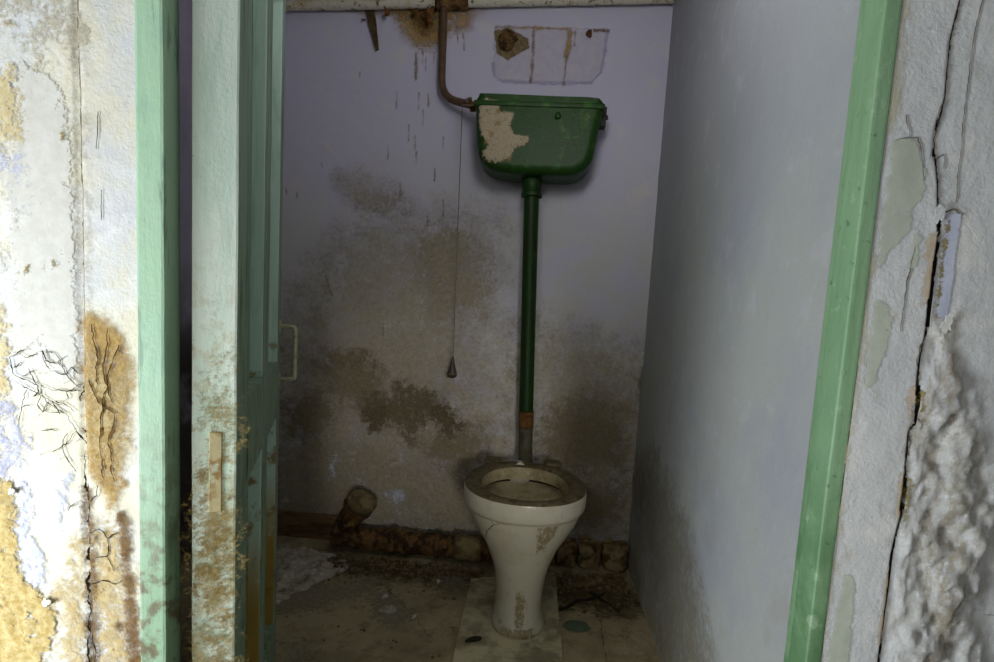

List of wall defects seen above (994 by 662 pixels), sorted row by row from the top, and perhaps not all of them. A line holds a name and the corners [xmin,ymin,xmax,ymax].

corrosion [365,6,468,79]
spalling [494,27,529,61]
crack [897,0,983,228]
spalling [0,393,56,662]
peeling [0,60,80,384]
crack [9,350,124,662]
leakage [278,234,487,531]
leakage [537,341,637,536]
crack [900,249,924,383]
crack [904,417,923,469]
spalling [904,386,926,424]
peeling [877,138,962,334]